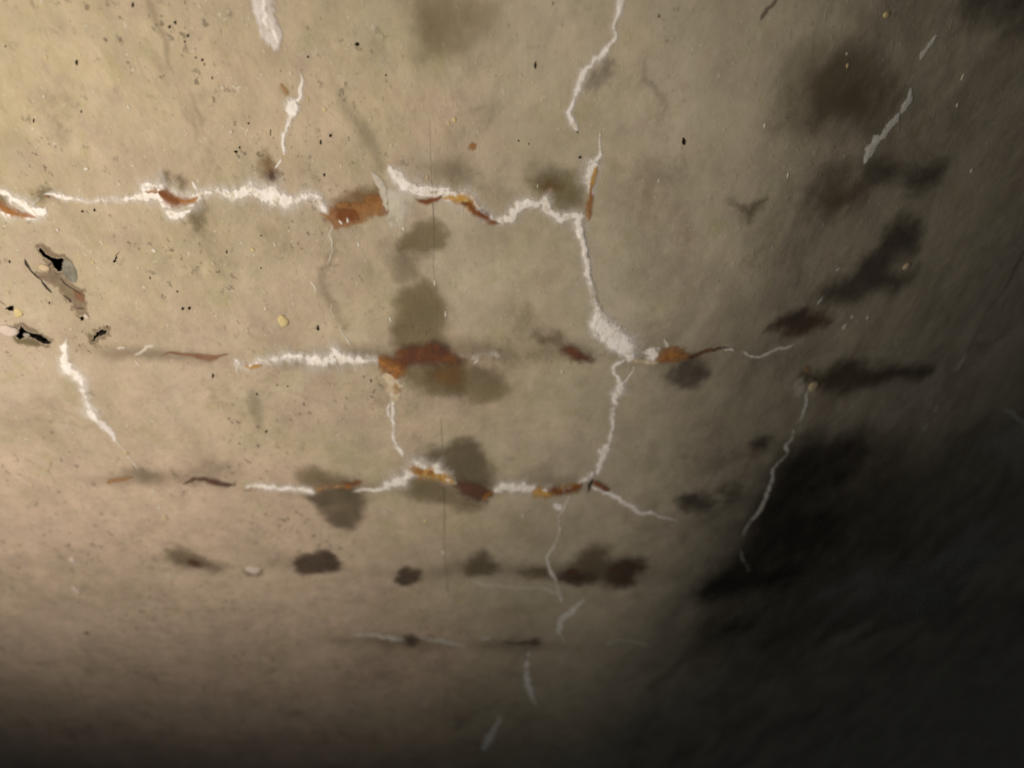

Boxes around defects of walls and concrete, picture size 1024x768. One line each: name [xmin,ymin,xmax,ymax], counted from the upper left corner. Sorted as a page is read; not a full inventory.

rust [325,190,388,228]
water stain [372,165,451,250]
spalling [24,248,90,321]
crack [0,76,456,494]
spalling [0,305,51,345]
rust [377,343,478,384]
rust [540,338,589,361]
crack [415,0,796,705]
water stain [302,469,363,528]
water stain [425,440,488,484]
crack [740,390,809,571]
water stain [295,551,340,574]